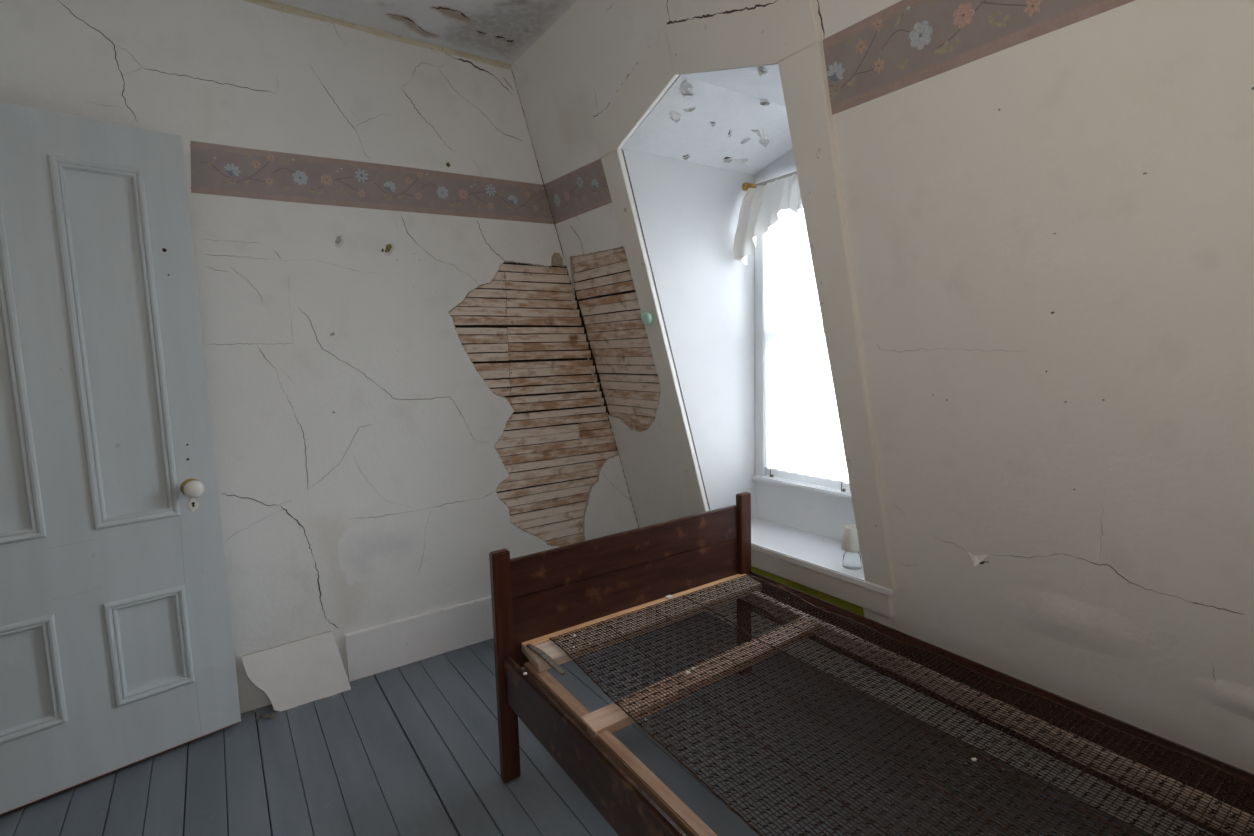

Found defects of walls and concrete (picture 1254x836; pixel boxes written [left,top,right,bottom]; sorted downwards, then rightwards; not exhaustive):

crack [60,2,278,123]
damp [432,0,577,64]
crack [309,53,584,257]
peeling [626,80,792,174]
crack [204,239,495,628]
flaking render [448,247,624,547]
crack [1003,503,1241,614]